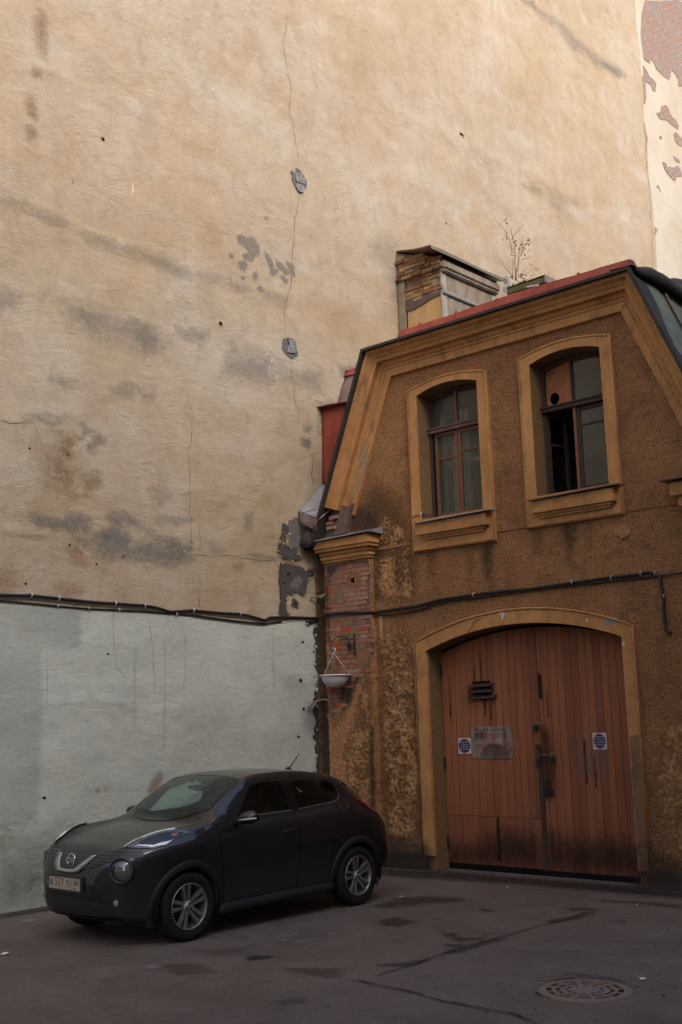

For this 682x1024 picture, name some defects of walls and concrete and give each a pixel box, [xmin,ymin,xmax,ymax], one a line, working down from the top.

flaking render [640,0,682,104]
flaking render [644,105,682,181]
crack [184,434,276,606]
flaking render [276,517,314,616]
peeling [297,515,421,844]